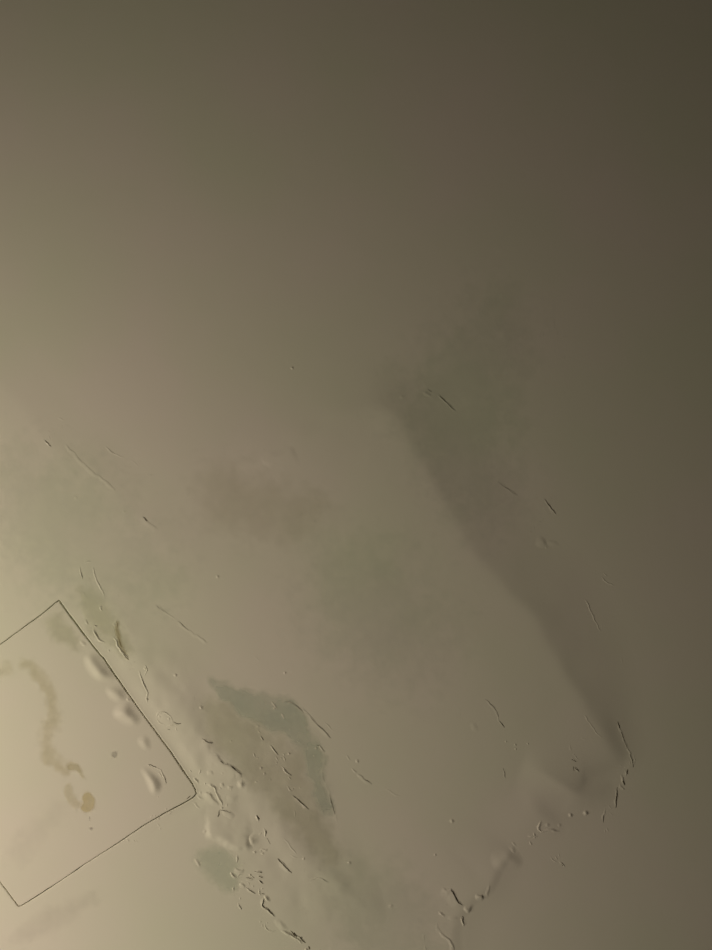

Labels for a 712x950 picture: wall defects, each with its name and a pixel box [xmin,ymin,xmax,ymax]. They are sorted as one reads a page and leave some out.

peeling [187,738,247,809]
crack [601,722,635,833]
crack [423,882,490,950]